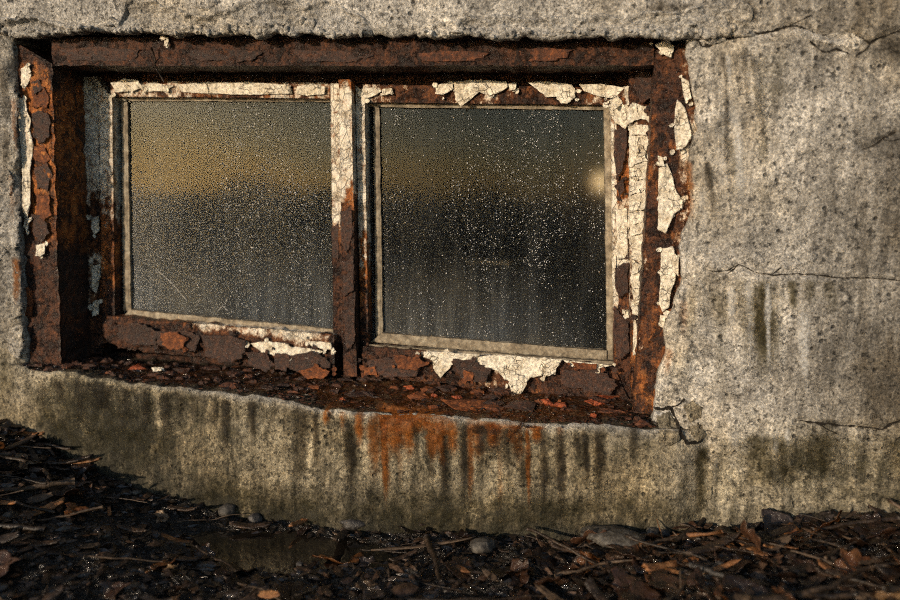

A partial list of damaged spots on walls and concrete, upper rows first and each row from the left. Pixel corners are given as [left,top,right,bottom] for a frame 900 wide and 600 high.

spalling [0,0,377,48]
peeling [111,78,326,98]
corrosion [613,128,628,201]
peeling [528,75,693,355]
crack [705,264,900,281]
corrosion [560,254,638,414]
corrosion [449,356,491,385]
damp [461,426,510,471]
damp [540,431,565,491]
damp [575,434,603,475]
crack [652,398,704,445]
crack [798,420,900,435]